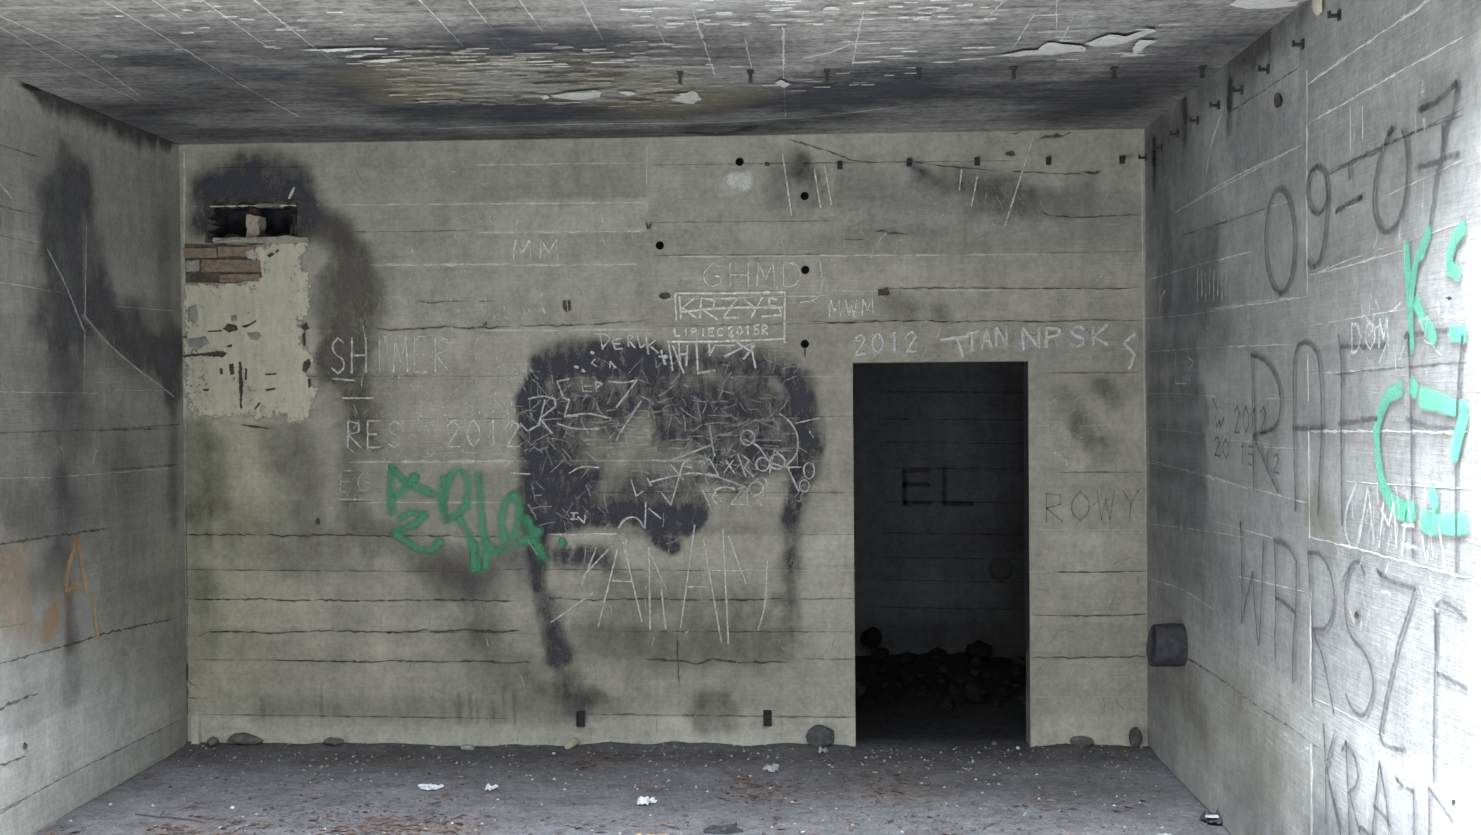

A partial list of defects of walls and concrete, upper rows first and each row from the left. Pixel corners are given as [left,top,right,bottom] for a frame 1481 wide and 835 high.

peeling [1230,0,1322,16]
flaking render [182,197,319,429]